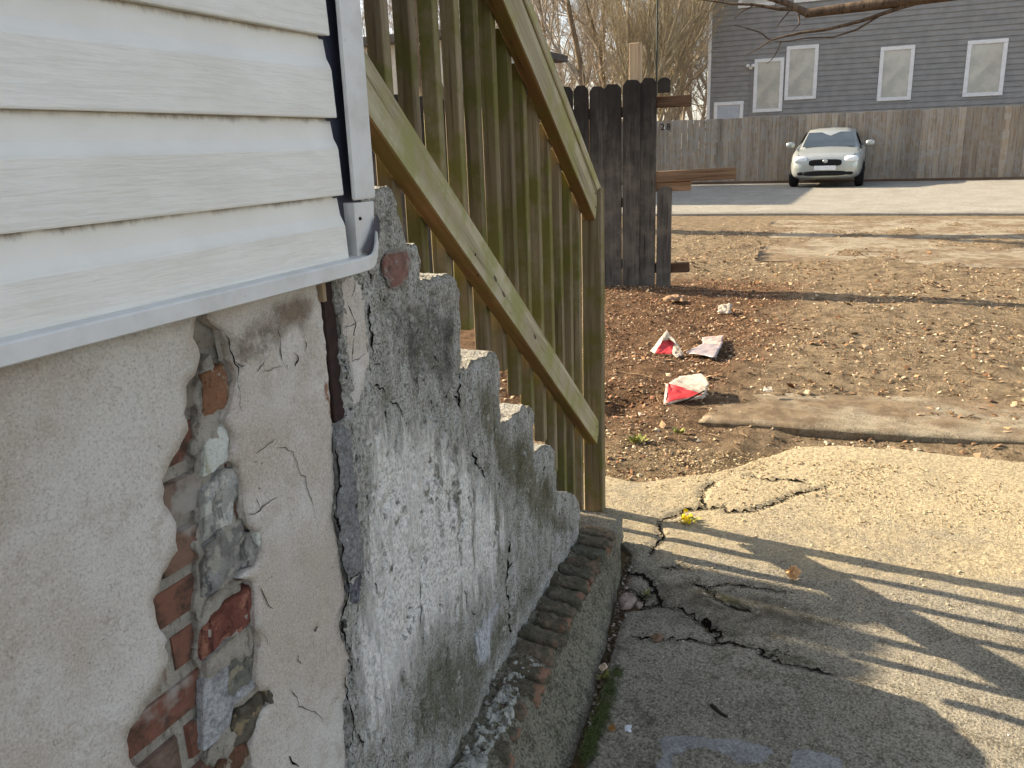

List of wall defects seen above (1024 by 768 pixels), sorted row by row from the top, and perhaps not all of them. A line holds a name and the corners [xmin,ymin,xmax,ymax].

crack [225,330,307,411]
flaking render [187,353,274,768]
crack [258,426,381,761]
crack [504,541,512,641]